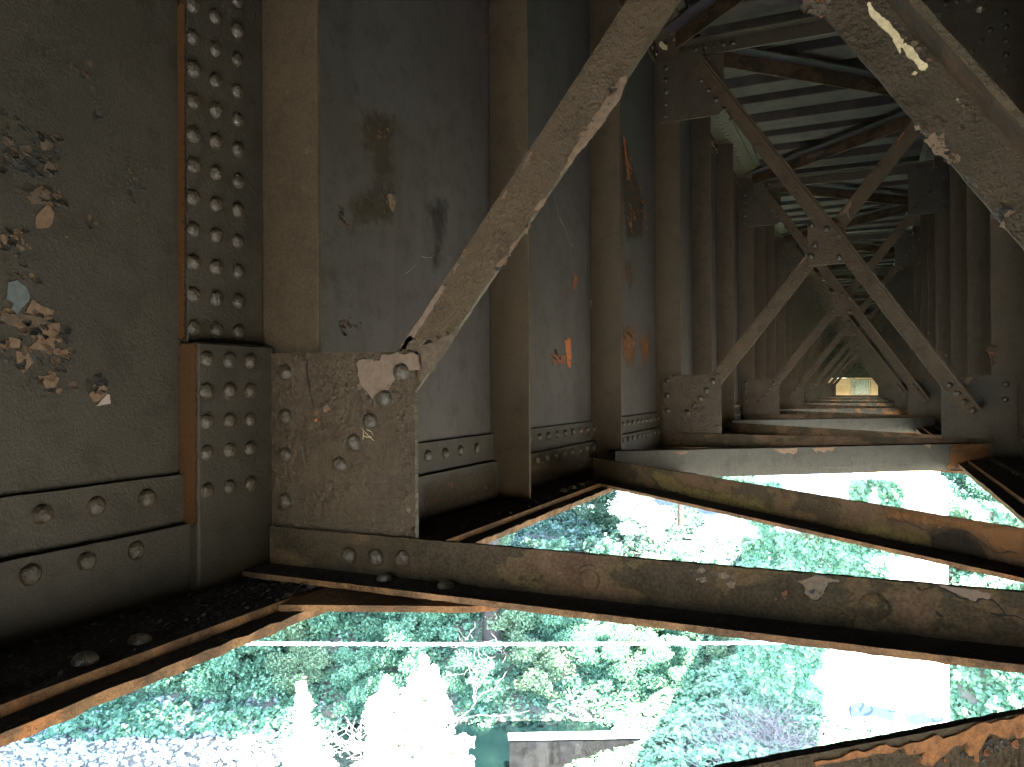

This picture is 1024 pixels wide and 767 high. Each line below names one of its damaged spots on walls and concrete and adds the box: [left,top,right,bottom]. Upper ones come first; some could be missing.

peeling [867,2,931,75]
peeling [560,75,627,176]
corrosion [622,137,648,238]
peeling [897,126,978,189]
peeling [0,110,111,406]
peeling [493,198,547,273]
peeling [356,284,459,399]
corrosion [551,337,572,368]
peeling [798,575,841,601]